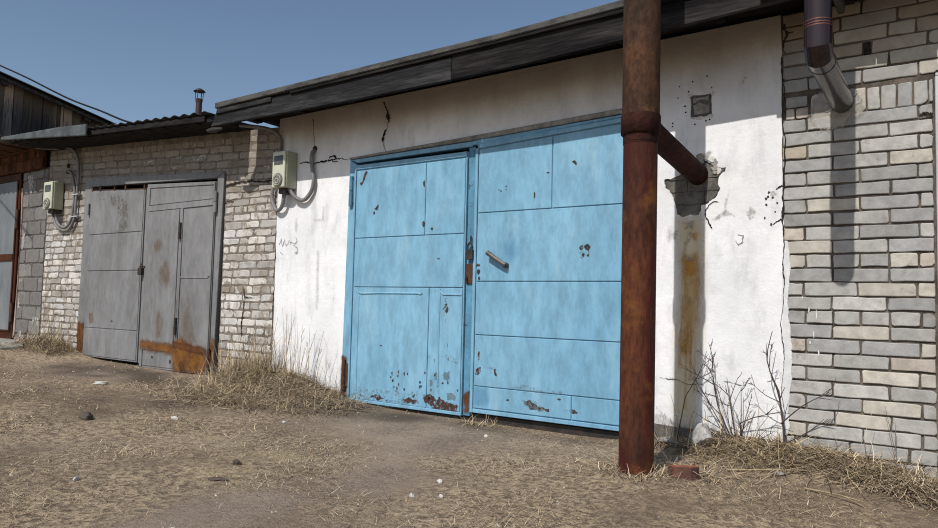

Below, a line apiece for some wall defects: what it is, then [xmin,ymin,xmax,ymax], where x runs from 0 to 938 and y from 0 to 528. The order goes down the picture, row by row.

crack [381,102,390,149]
spalling [665,152,726,217]
crack [774,24,794,414]
rust [140,316,214,374]
rust [674,219,701,428]